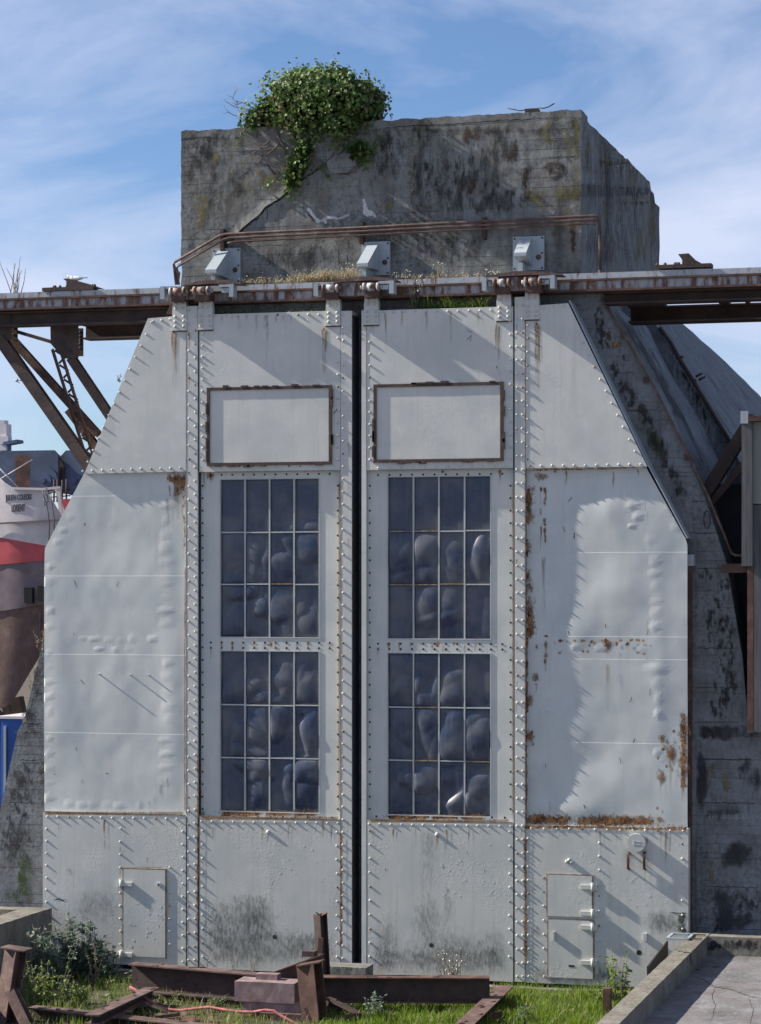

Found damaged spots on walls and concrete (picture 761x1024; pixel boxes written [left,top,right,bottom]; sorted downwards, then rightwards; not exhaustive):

crack [226,151,342,247]
leakage [440,128,529,211]
mould [611,363,683,496]
rust [167,473,186,546]
leakage [699,568,753,741]
rust [46,484,342,947]
rust [371,469,688,965]
leakage [697,753,733,818]
leakage [723,843,751,866]
leakage [706,891,761,950]